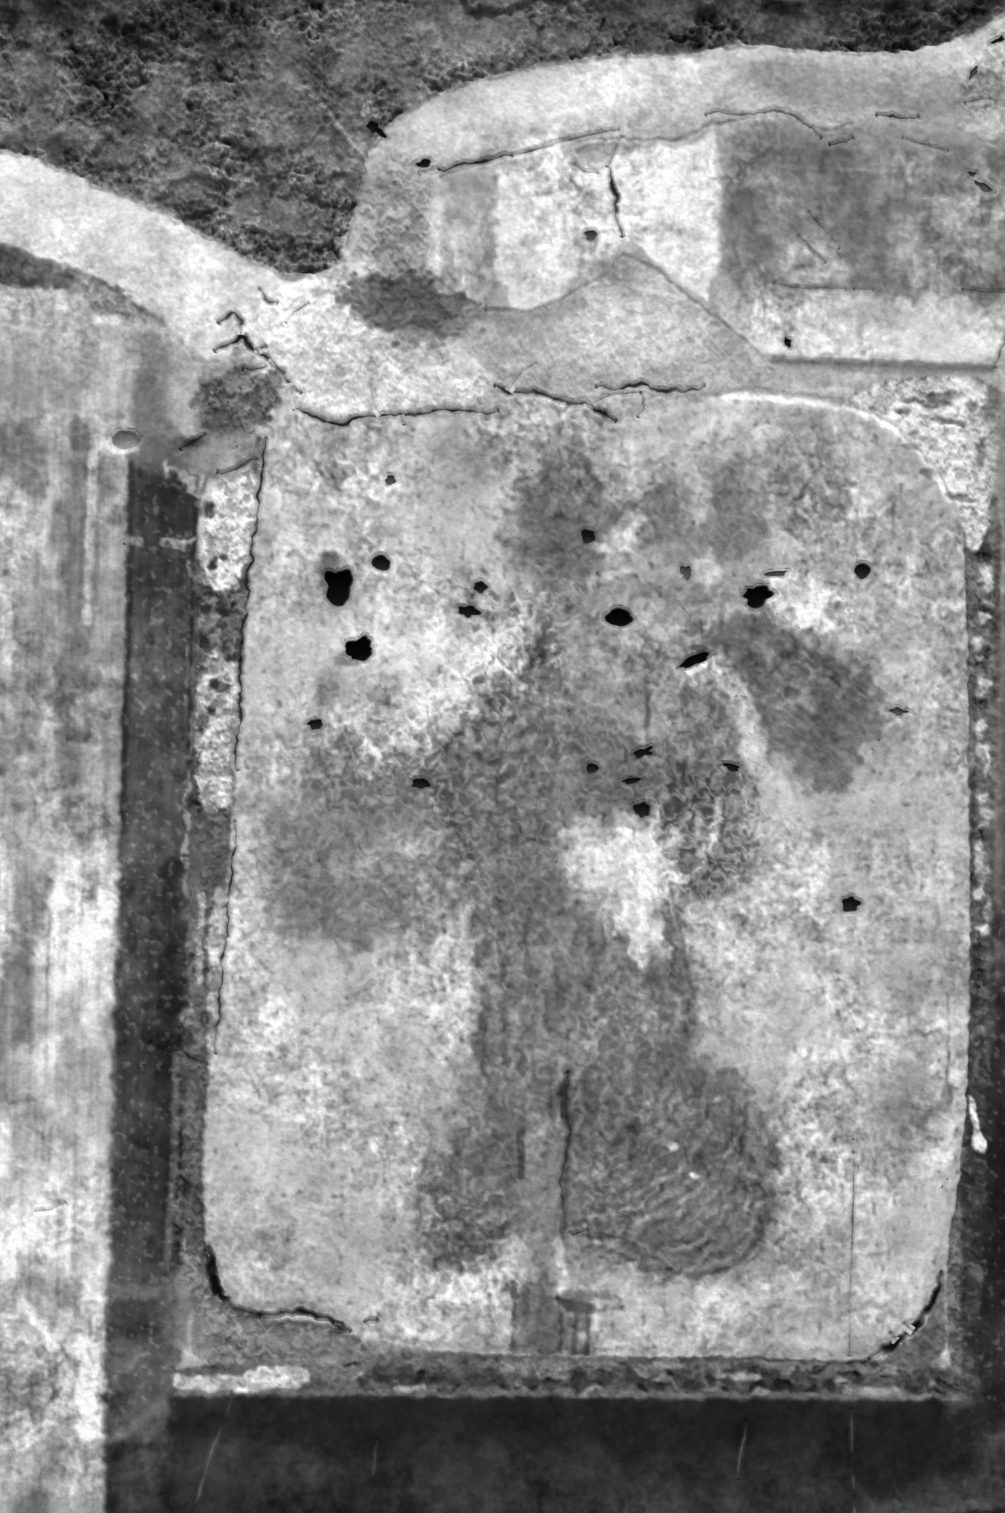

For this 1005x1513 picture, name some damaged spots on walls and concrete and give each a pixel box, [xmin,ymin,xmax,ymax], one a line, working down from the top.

flaking render [0,0,1005,359]
crack [420,127,626,236]
crack [706,106,947,154]
crack [774,211,873,293]
crack [963,287,1005,367]
flaking render [189,364,282,595]
flaking render [851,375,1000,553]
spalling [315,551,345,577]
flaking render [192,644,238,816]
crack [205,1247,376,1334]
crack [848,1409,858,1513]
crack [969,1505,1005,1513]